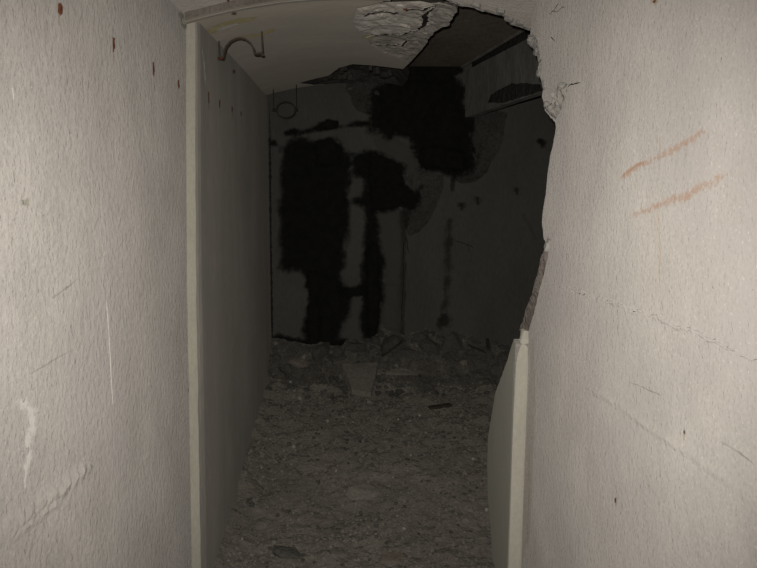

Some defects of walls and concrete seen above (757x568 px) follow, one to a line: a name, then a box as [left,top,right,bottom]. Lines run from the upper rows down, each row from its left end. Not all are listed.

spalling [301,0,581,236]
leakage [270,120,466,346]
spalling [520,237,552,331]
leakage [20,397,40,488]